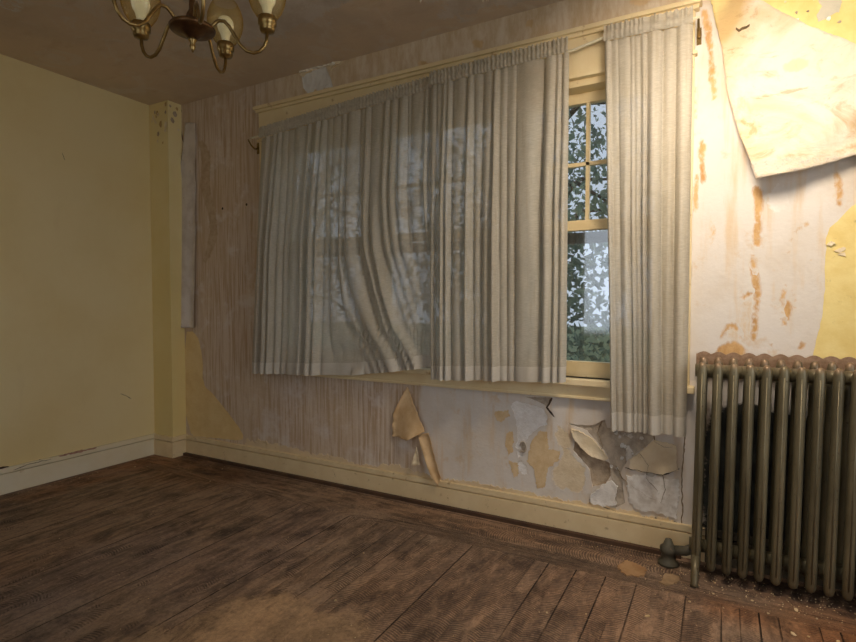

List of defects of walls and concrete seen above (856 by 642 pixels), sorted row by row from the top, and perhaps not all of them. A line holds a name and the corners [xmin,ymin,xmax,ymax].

peeling [817,0,842,22]
water stain [692,7,719,250]
water stain [708,184,798,356]
peeling [392,387,441,486]
spalling [494,400,680,519]
crack [670,436,686,523]